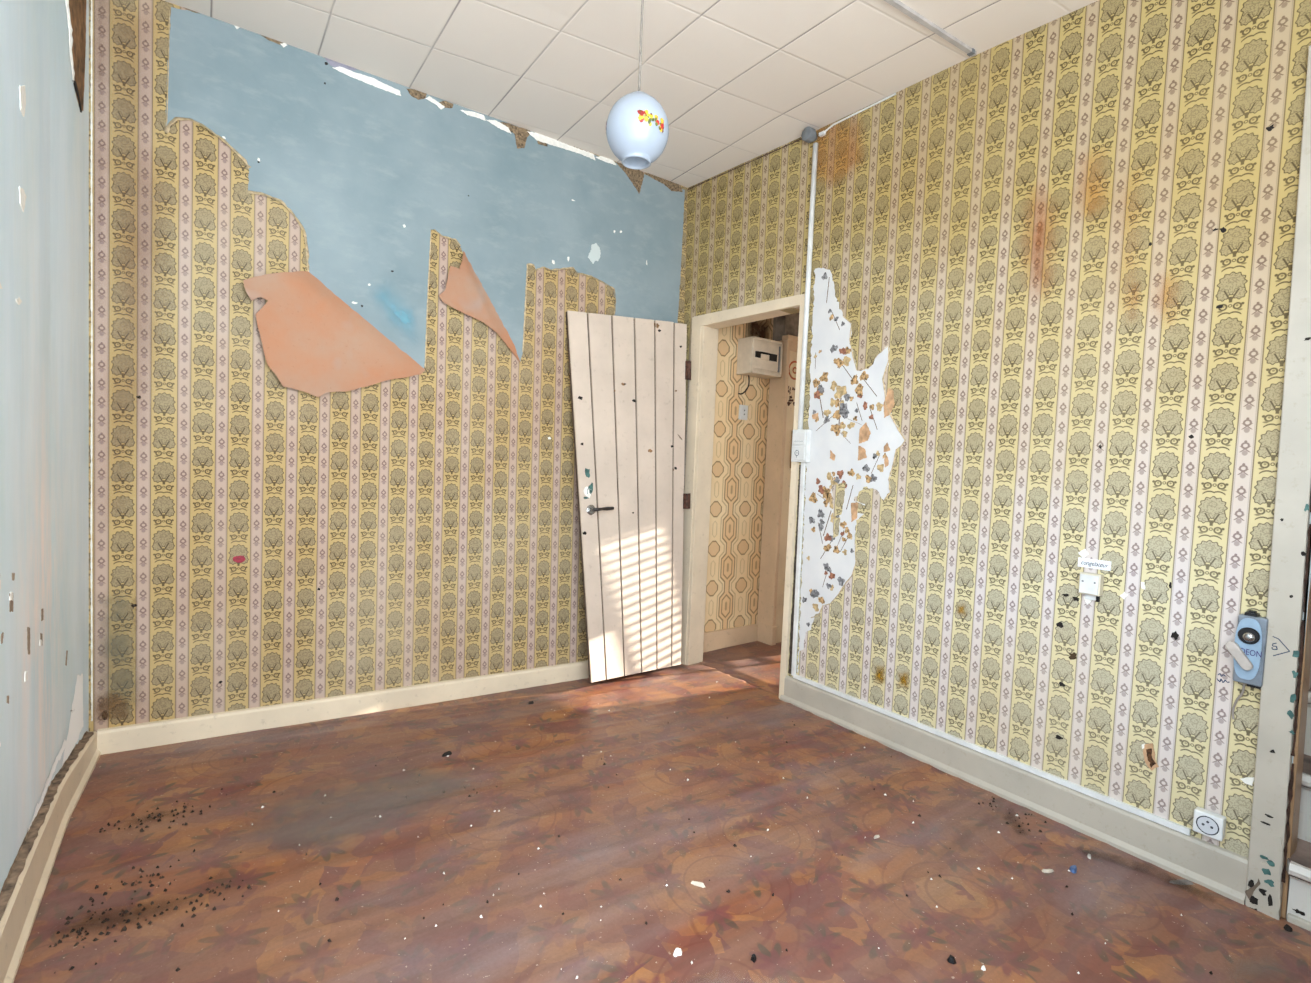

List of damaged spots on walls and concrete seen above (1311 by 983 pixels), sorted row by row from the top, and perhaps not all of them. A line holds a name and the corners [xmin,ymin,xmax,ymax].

peeling [164,7,685,397]
peeling [797,268,906,672]